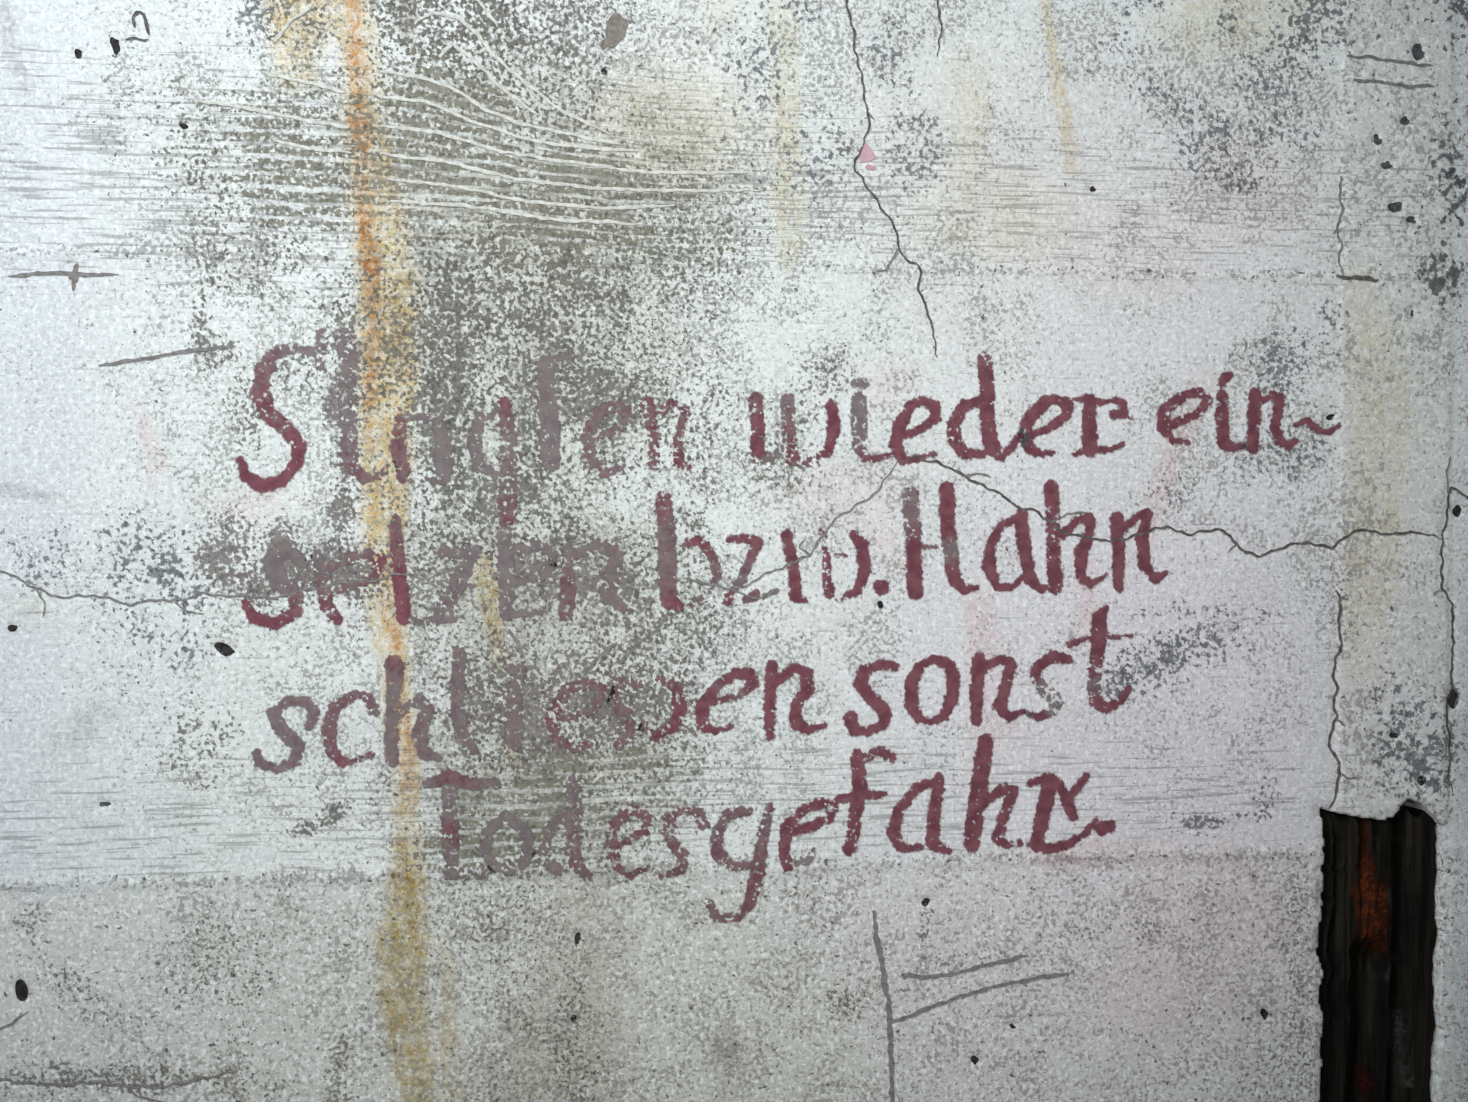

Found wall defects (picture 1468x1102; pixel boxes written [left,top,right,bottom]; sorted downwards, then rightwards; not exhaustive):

crack [846,0,938,358]
crack [936,0,944,57]
crack [0,570,463,617]
crack [683,456,1468,809]